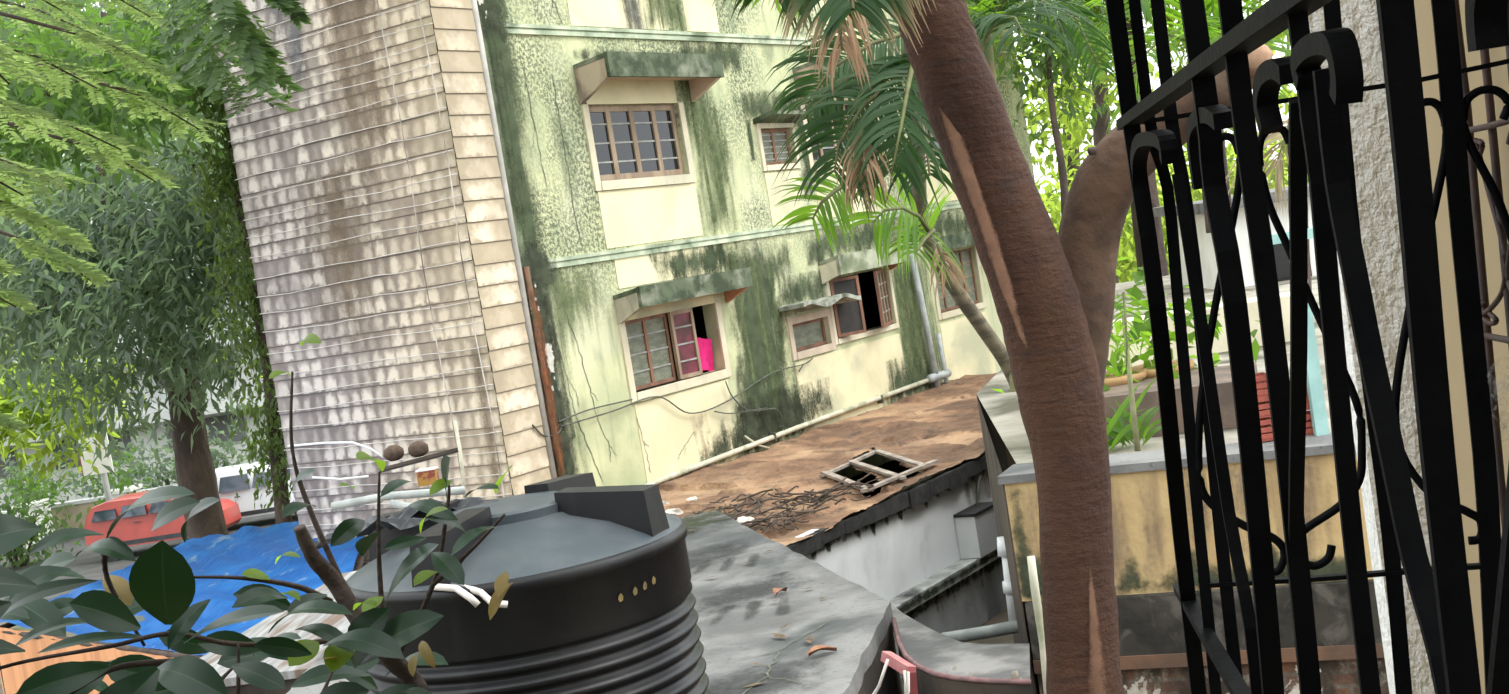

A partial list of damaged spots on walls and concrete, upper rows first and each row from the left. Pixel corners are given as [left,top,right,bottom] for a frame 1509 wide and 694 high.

leakage [624,0,742,69]
leakage [479,0,524,222]
leakage [688,80,728,221]
leakage [673,255,685,278]
rust [532,291,564,474]
leakage [520,242,578,476]
leakage [702,218,913,466]
peeling [1123,676,1161,694]
peeling [1285,665,1300,694]